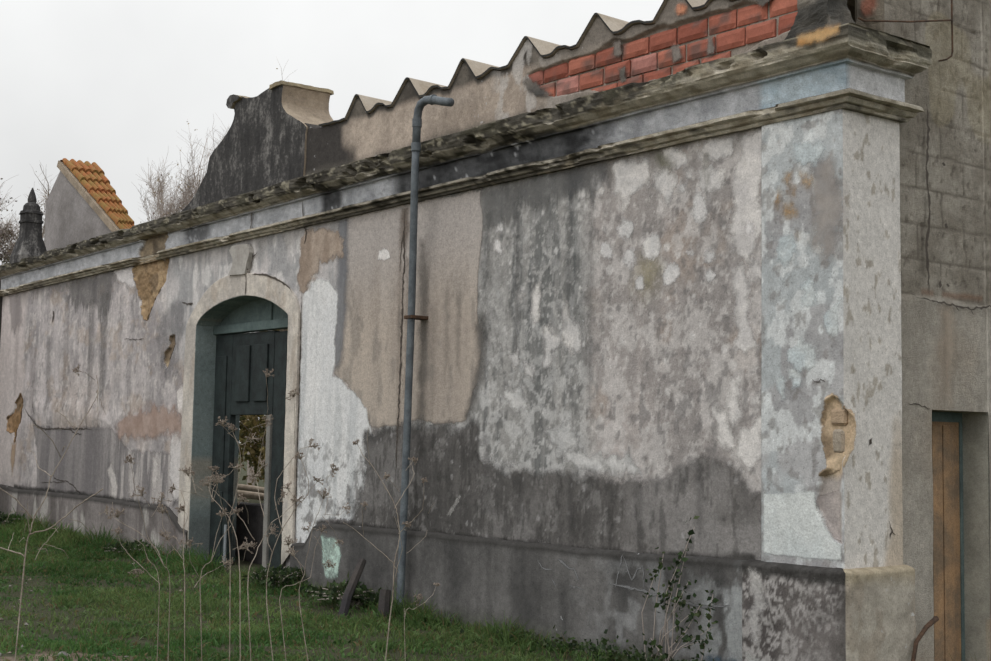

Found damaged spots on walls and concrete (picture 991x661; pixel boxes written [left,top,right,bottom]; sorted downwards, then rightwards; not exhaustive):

crack [912,110,991,315]
flaking render [6,393,23,444]
crack [23,405,92,435]
flaking render [114,259,170,321]
flaking render [118,387,183,499]
flaking render [164,335,176,367]
peeling [296,228,372,577]
water stain [418,244,427,385]
water stain [316,317,761,590]
flaking render [819,393,856,476]